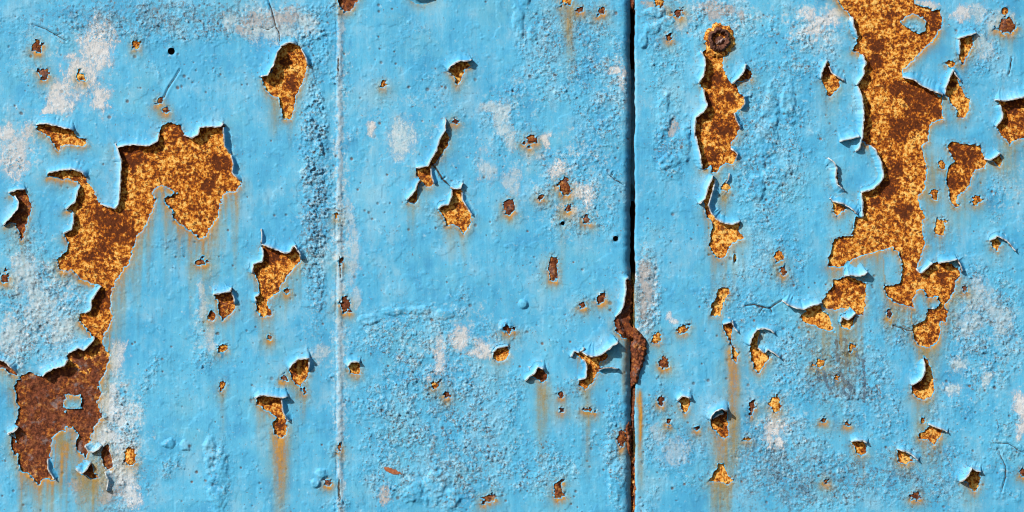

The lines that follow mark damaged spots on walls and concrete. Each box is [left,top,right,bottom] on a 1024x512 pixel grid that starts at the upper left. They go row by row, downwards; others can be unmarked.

peeling [0,114,243,497]
peeling [207,228,308,323]
peeling [252,347,316,499]
peeling [260,35,314,122]
peeling [403,119,476,237]
peeling [566,274,635,392]
peeling [687,48,753,262]
peeling [673,287,783,487]
peeling [782,0,977,403]
peeling [946,85,1024,209]